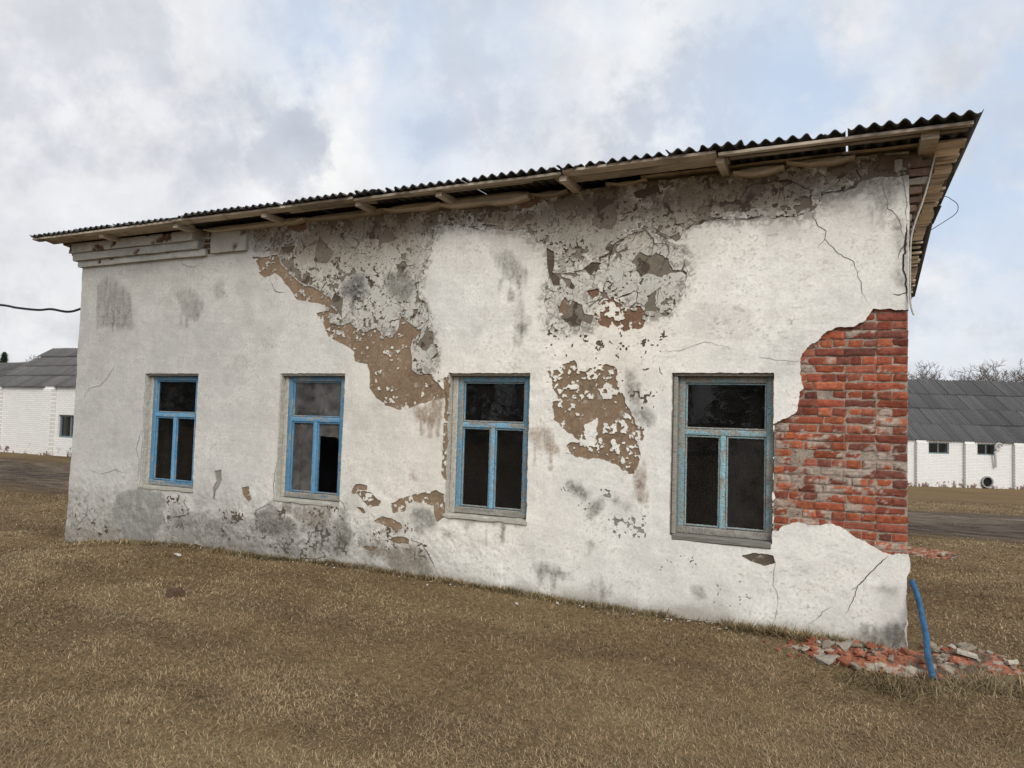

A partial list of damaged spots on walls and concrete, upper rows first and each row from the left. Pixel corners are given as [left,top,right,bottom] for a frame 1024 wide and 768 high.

crack [573,163,908,307]
flaking render [253,154,909,480]
flaking render [773,309,908,555]
peeling [352,483,445,560]
crack [811,556,888,623]